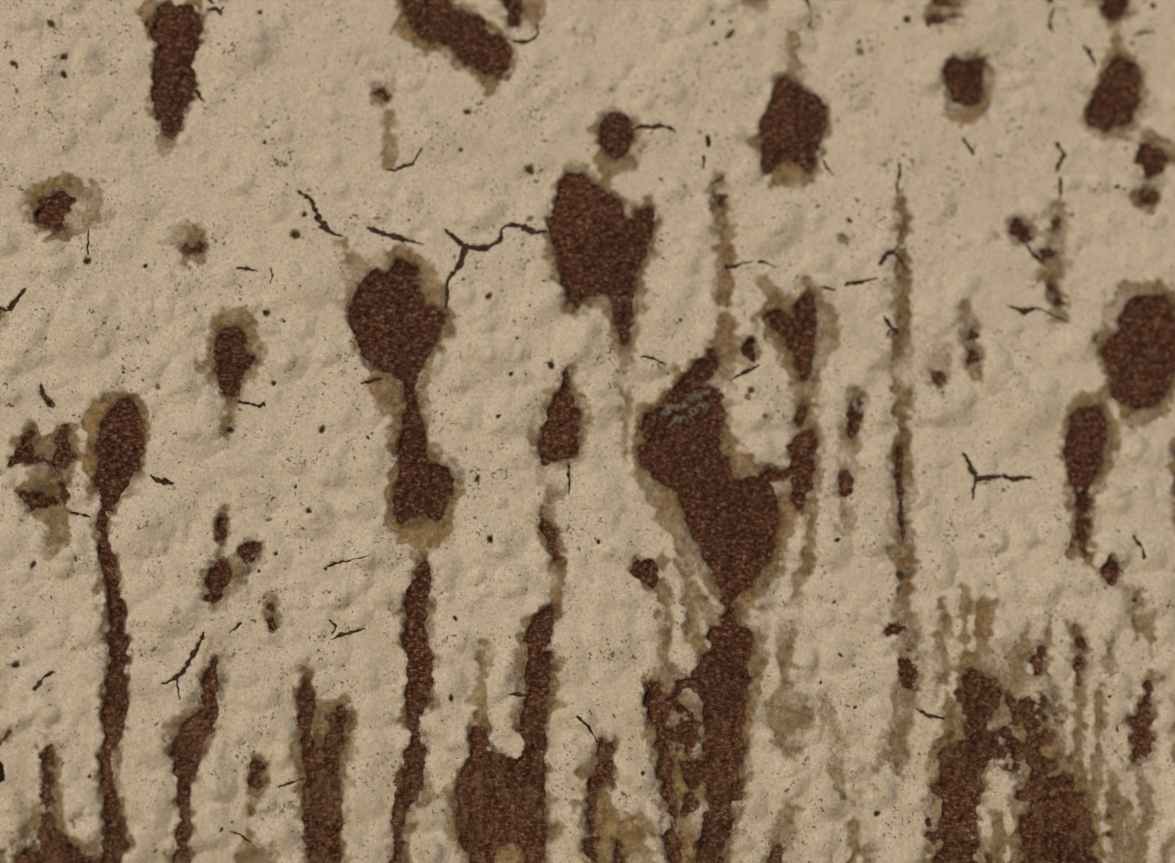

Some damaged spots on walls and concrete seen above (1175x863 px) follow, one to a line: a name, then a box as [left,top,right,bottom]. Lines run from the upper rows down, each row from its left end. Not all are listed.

crack [297,190,547,310]
crack [962,452,1033,500]